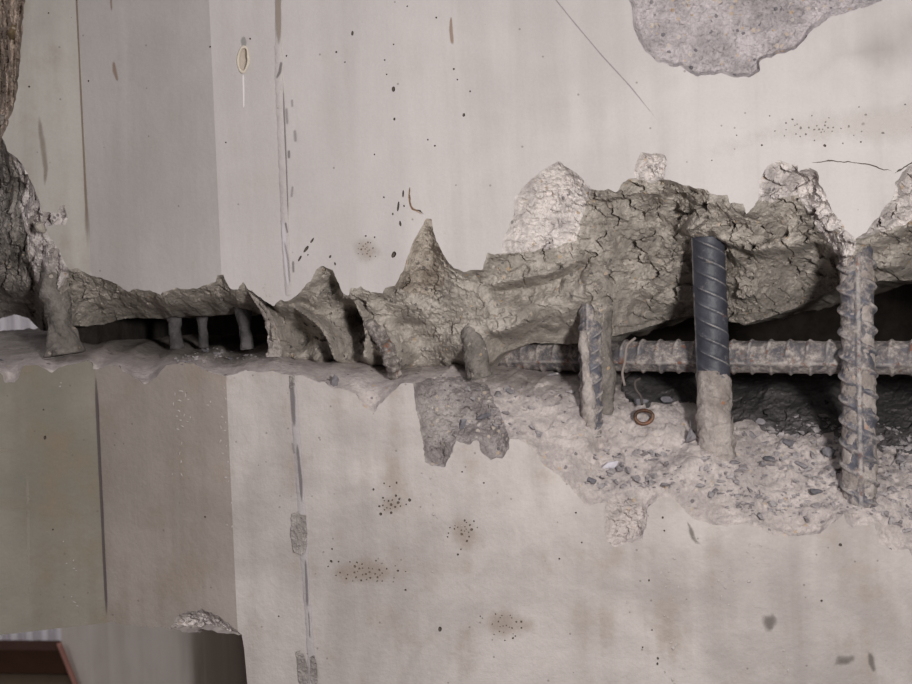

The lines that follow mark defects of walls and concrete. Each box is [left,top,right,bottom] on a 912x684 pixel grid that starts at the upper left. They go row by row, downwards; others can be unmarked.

spalling [629,0,882,77]
crack [812,160,912,173]
spalling [0,139,912,555]
spalling [168,609,242,635]